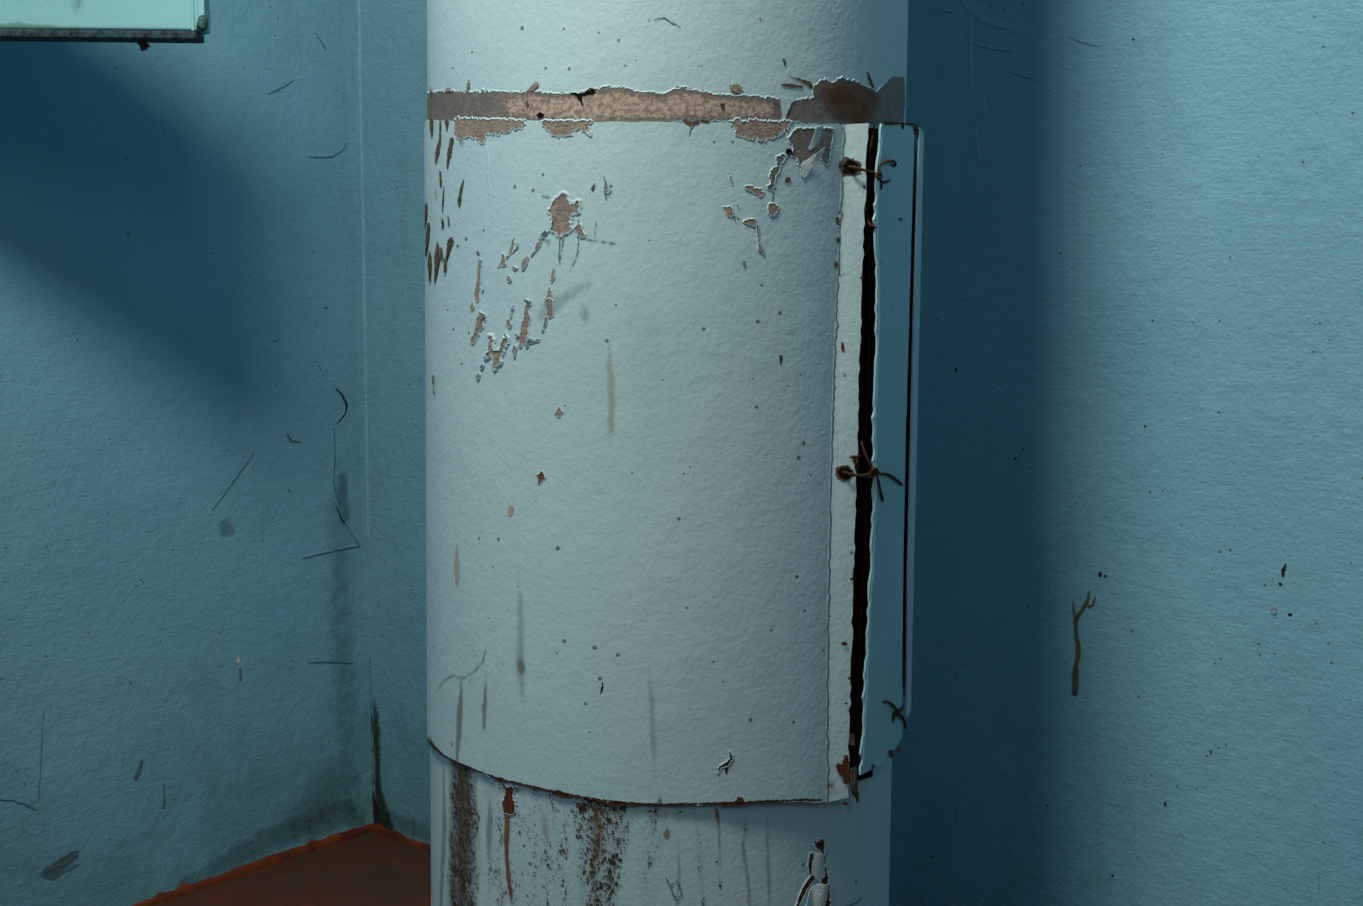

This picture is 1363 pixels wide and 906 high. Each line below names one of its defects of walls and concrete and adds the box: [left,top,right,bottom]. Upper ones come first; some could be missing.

peeling [470,176,615,380]
peeling [424,58,906,282]
peeling [535,470,546,486]
rust [427,83,920,903]
spalling [834,180,880,767]
peeling [795,835,864,906]